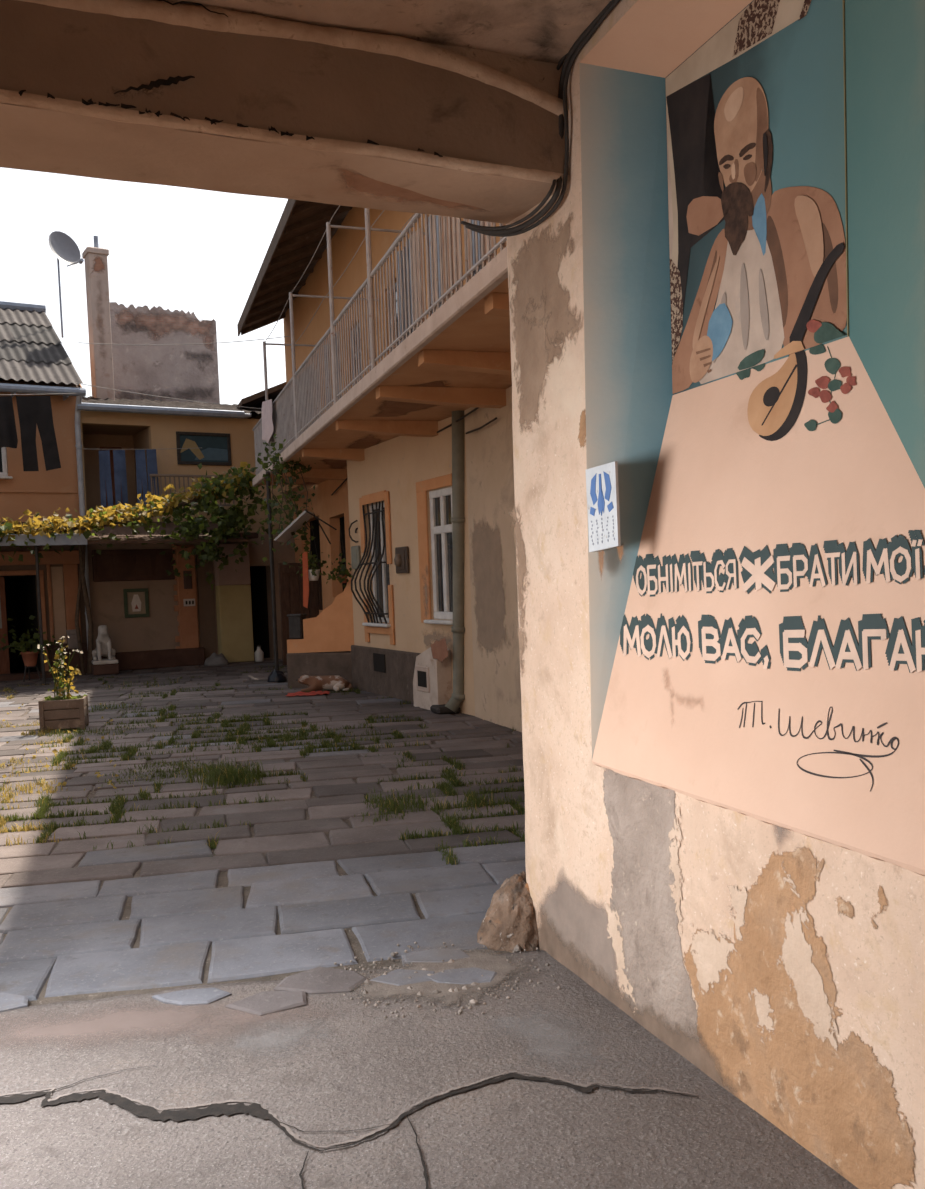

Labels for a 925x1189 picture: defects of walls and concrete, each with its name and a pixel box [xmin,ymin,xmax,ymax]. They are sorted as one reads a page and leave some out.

flaking render [509,214,583,430]
flaking render [603,769,915,1189]
crack [0,1064,698,1189]